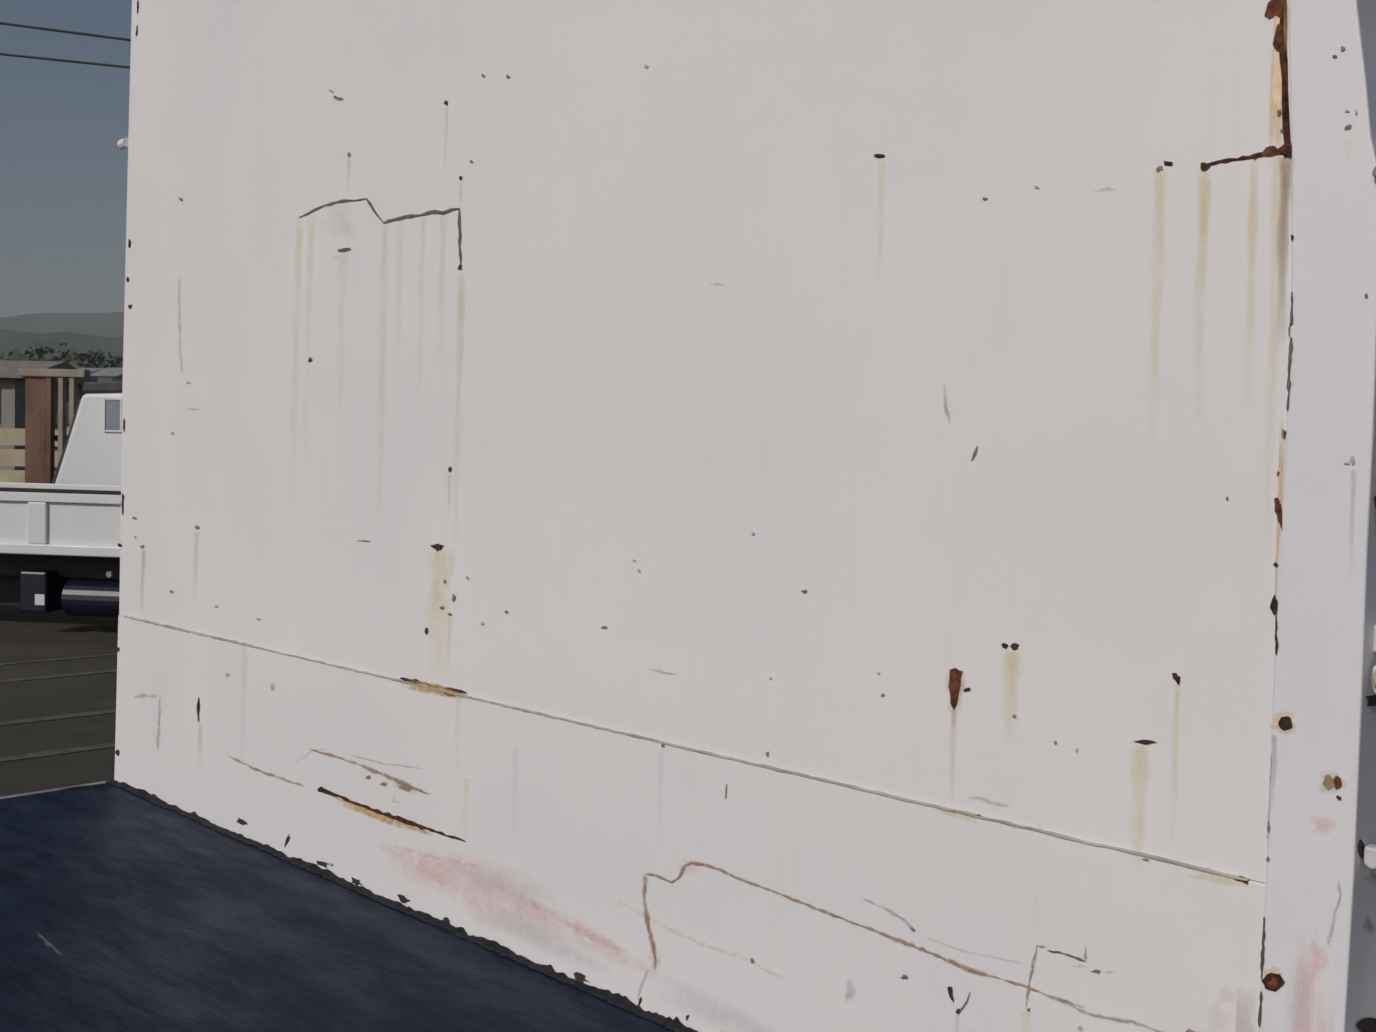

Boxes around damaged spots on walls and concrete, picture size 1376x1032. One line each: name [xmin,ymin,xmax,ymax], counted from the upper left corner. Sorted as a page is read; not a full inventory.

corrosion [1200,0,1294,240]
crack [298,198,462,270]
corrosion [1270,457,1282,655]
corrosion [400,677,467,697]
corrosion [948,668,962,710]
peeling [106,779,698,1032]
crack [643,862,1159,1032]
corrosion [1258,917,1285,1027]